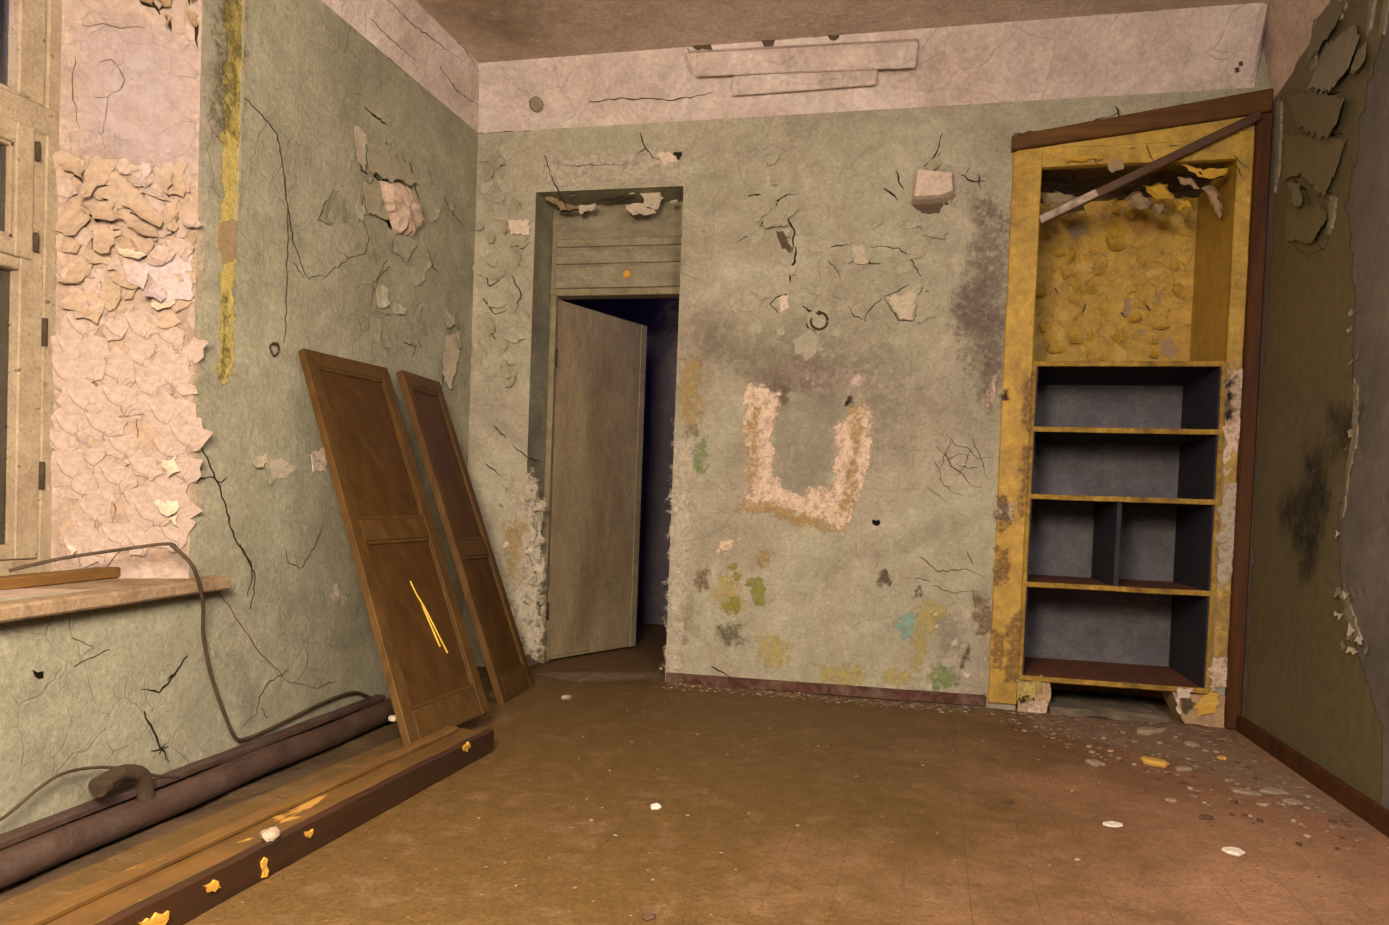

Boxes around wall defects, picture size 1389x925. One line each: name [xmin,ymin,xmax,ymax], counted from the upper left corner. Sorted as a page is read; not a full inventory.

crack [370,0,686,208]
crack [589,93,708,102]
peeling [50,0,248,568]
crack [141,655,188,762]
crack [79,419,337,726]
crack [244,98,470,356]
peeling [486,425,546,659]
peeling [737,358,877,537]
peeling [883,586,1050,713]
leakage [957,200,1007,407]
leakage [1280,413,1351,575]
peeling [1245,0,1389,804]